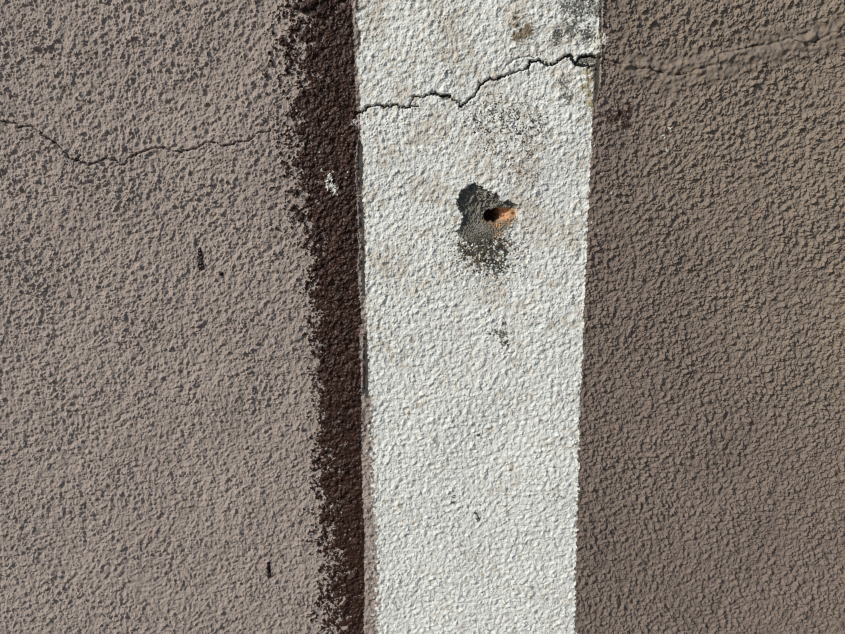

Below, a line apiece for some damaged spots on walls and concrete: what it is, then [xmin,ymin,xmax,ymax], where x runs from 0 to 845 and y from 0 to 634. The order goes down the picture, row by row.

crack [305,54,710,125]
crack [0,121,270,166]
spalling [454,182,518,243]